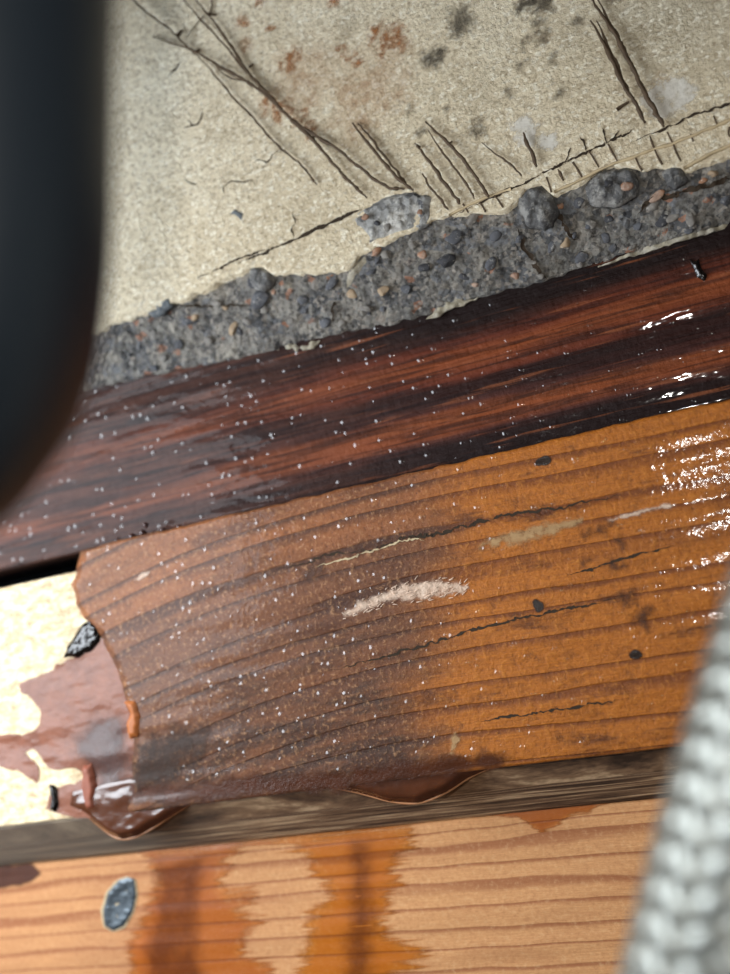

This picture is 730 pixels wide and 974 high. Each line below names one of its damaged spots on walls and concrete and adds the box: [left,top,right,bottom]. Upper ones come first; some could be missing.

rust [371,26,404,48]
water stain [451,7,469,36]
water stain [517,0,551,24]
water stain [423,48,445,66]
peeling [640,77,697,118]
peeling [510,116,558,151]
crack [223,151,280,193]
crack [453,103,730,218]
spalling [91,159,730,389]
water stain [535,456,551,466]
water stain [126,824,430,974]